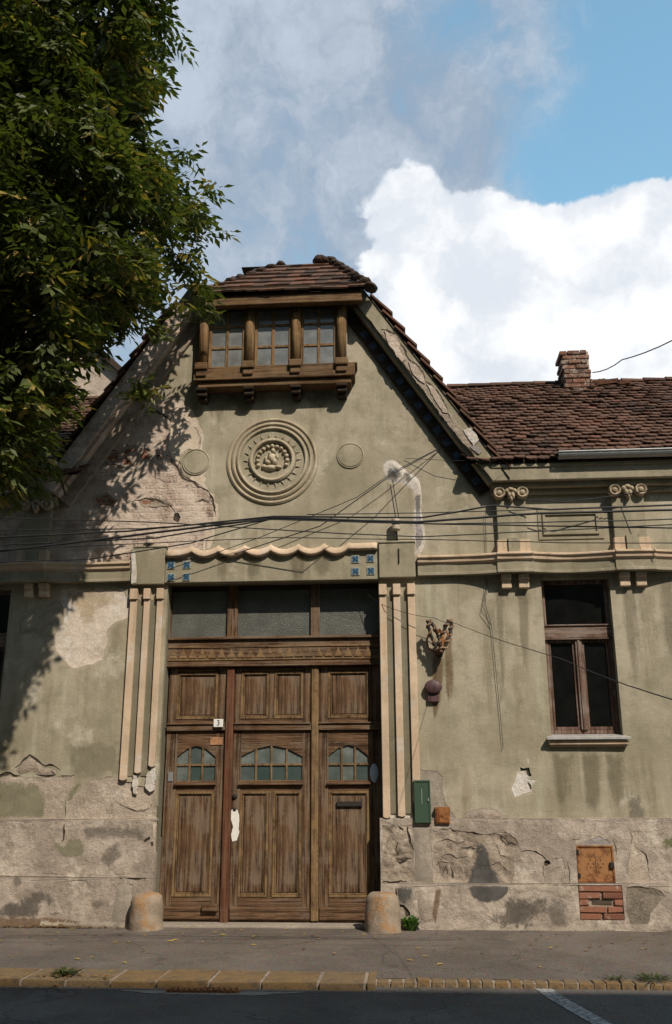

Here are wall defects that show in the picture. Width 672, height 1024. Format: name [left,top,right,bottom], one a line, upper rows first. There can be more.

spalling [49,396,219,671]
spalling [66,767,157,852]
spalling [508,758,539,799]
water stain [0,893,125,927]
water stain [437,845,602,931]
crack [521,839,580,881]